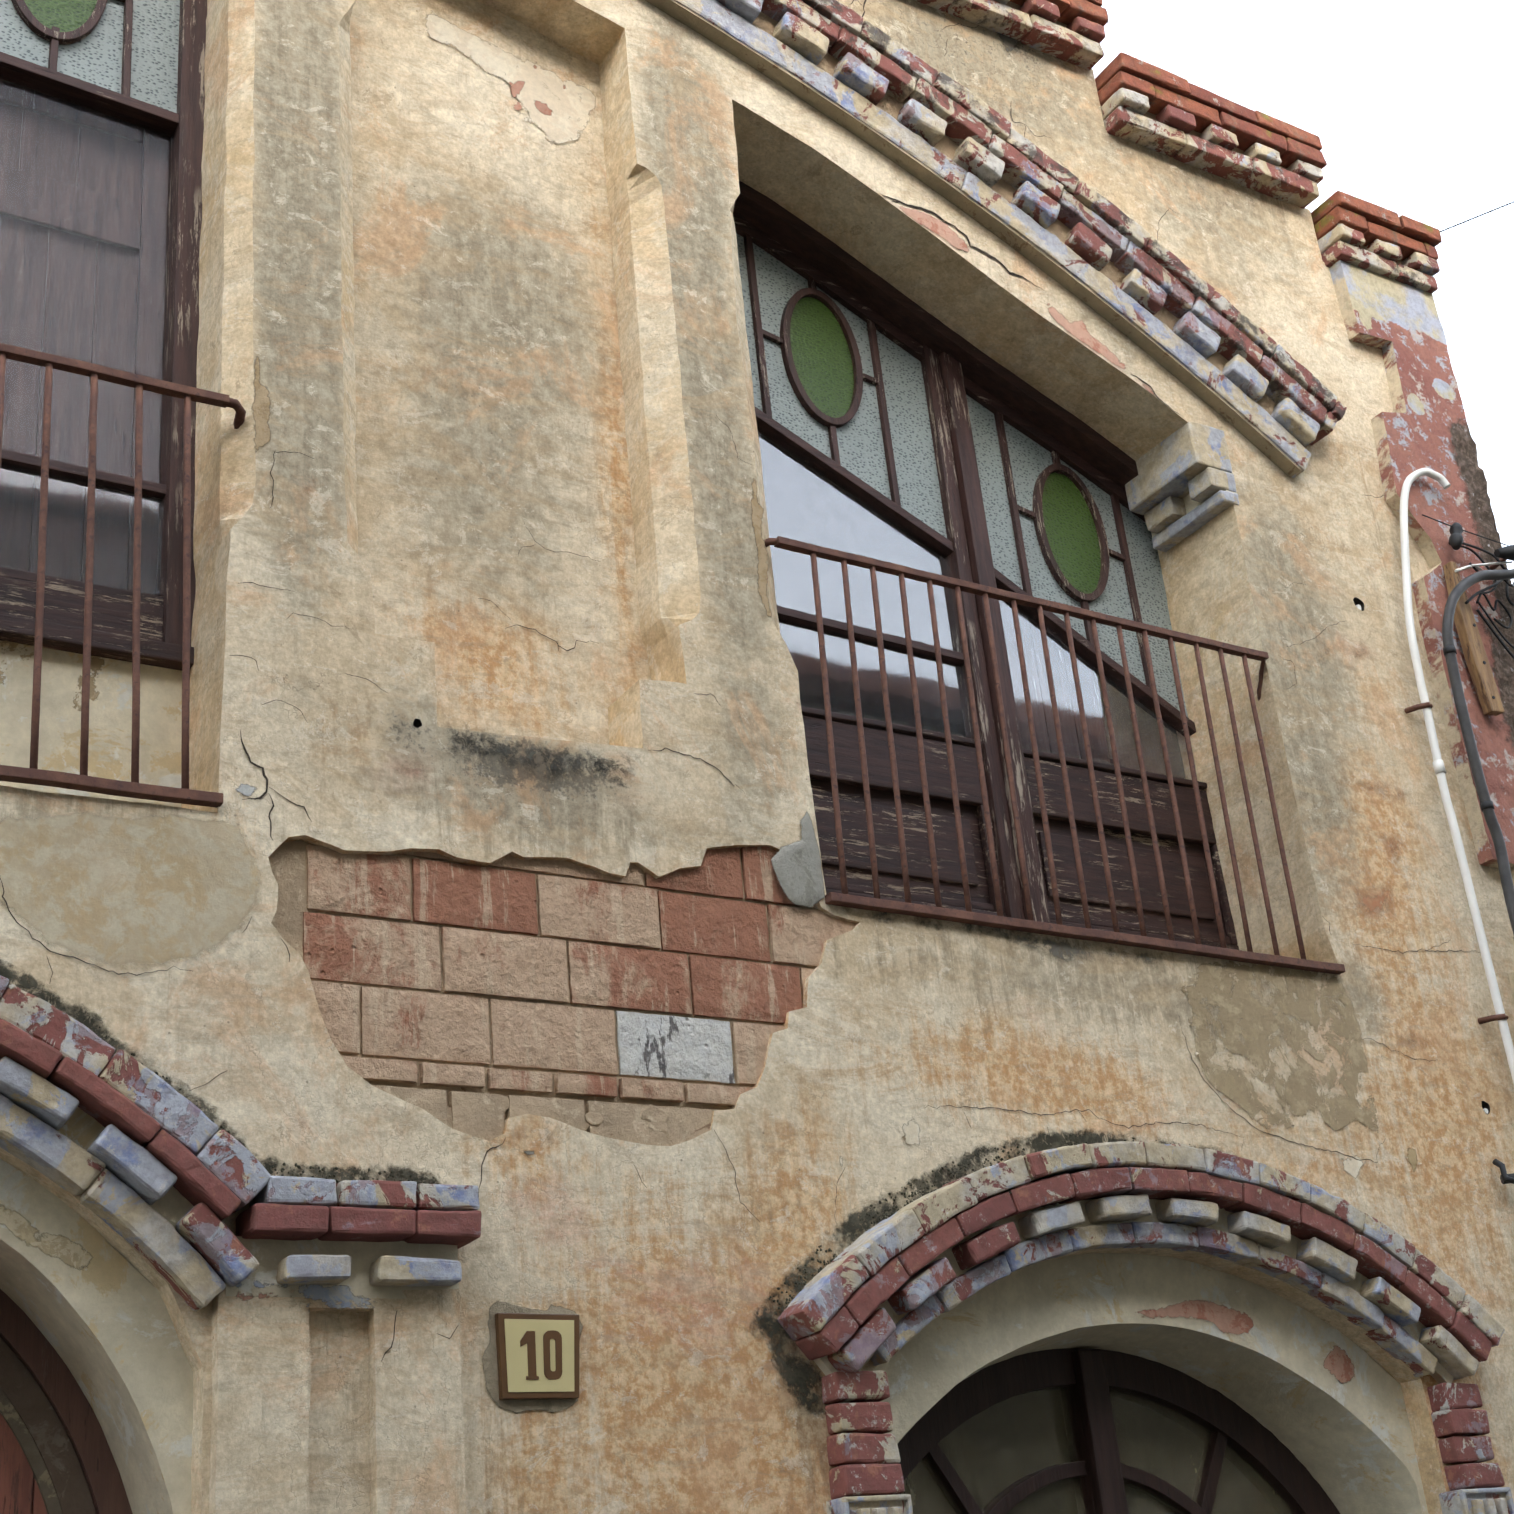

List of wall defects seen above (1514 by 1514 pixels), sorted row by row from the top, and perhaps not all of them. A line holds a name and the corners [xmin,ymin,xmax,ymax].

crack [881,194,1042,289]
crack [230,655,312,840]
water stain [451,729,630,782]
crack [0,878,191,982]
spalling [268,840,857,1146]
crack [925,1013,1386,1163]
peeling [1182,960,1378,1132]
peeling [1138,1300,1253,1335]
peeling [1324,1346,1355,1383]